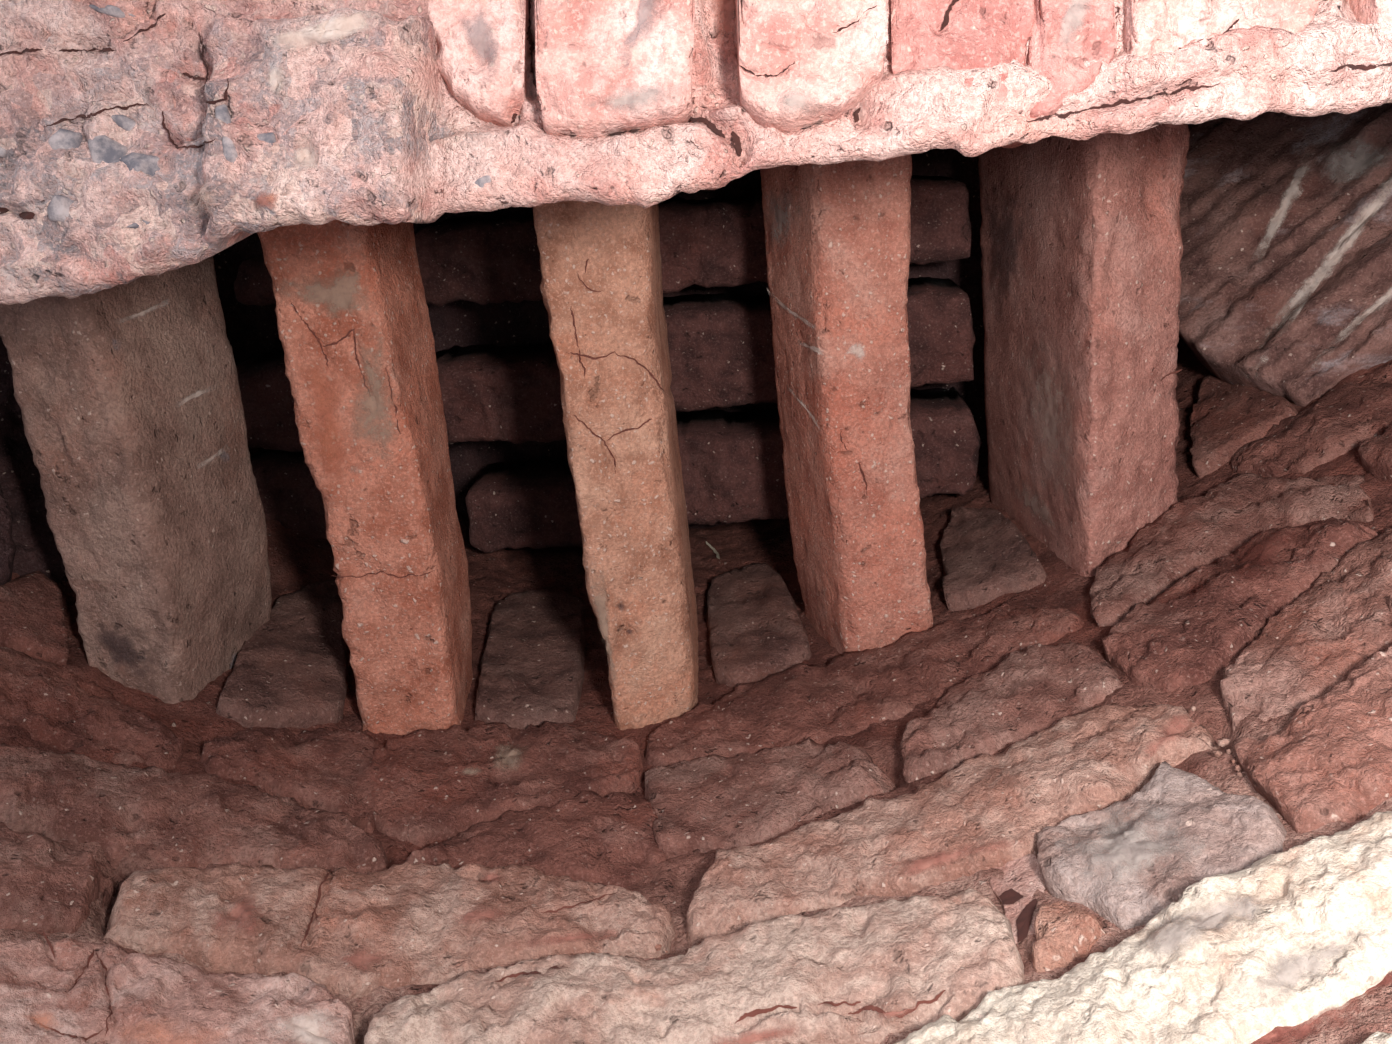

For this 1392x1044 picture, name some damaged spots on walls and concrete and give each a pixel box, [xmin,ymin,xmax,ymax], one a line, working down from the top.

crack [0,14,165,56]
crack [183,33,229,104]
crack [1027,82,1221,122]
crack [44,103,215,149]
crack [566,259,664,473]
crack [735,990,946,1024]